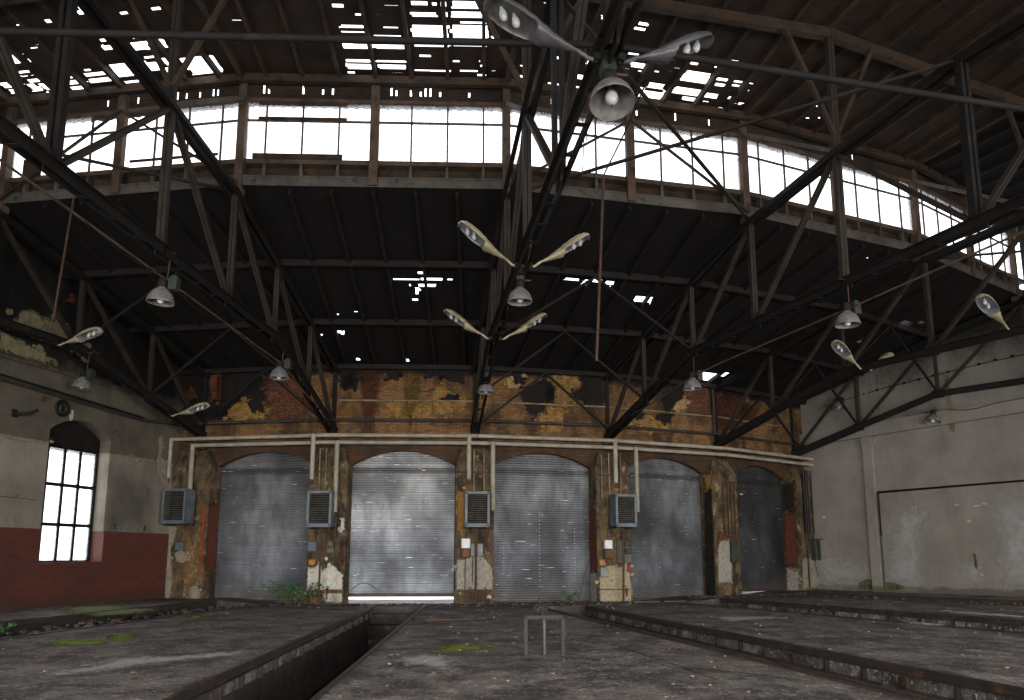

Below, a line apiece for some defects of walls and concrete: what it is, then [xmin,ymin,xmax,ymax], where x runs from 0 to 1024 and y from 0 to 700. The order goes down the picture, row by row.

peeling [385,370,468,422]
peeling [503,373,528,389]
peeling [534,375,587,433]
flaking render [629,388,712,435]
peeling [165,499,219,599]
peeling [304,562,343,603]
peeling [451,554,498,604]
peeling [589,503,634,602]
peeling [718,540,733,588]